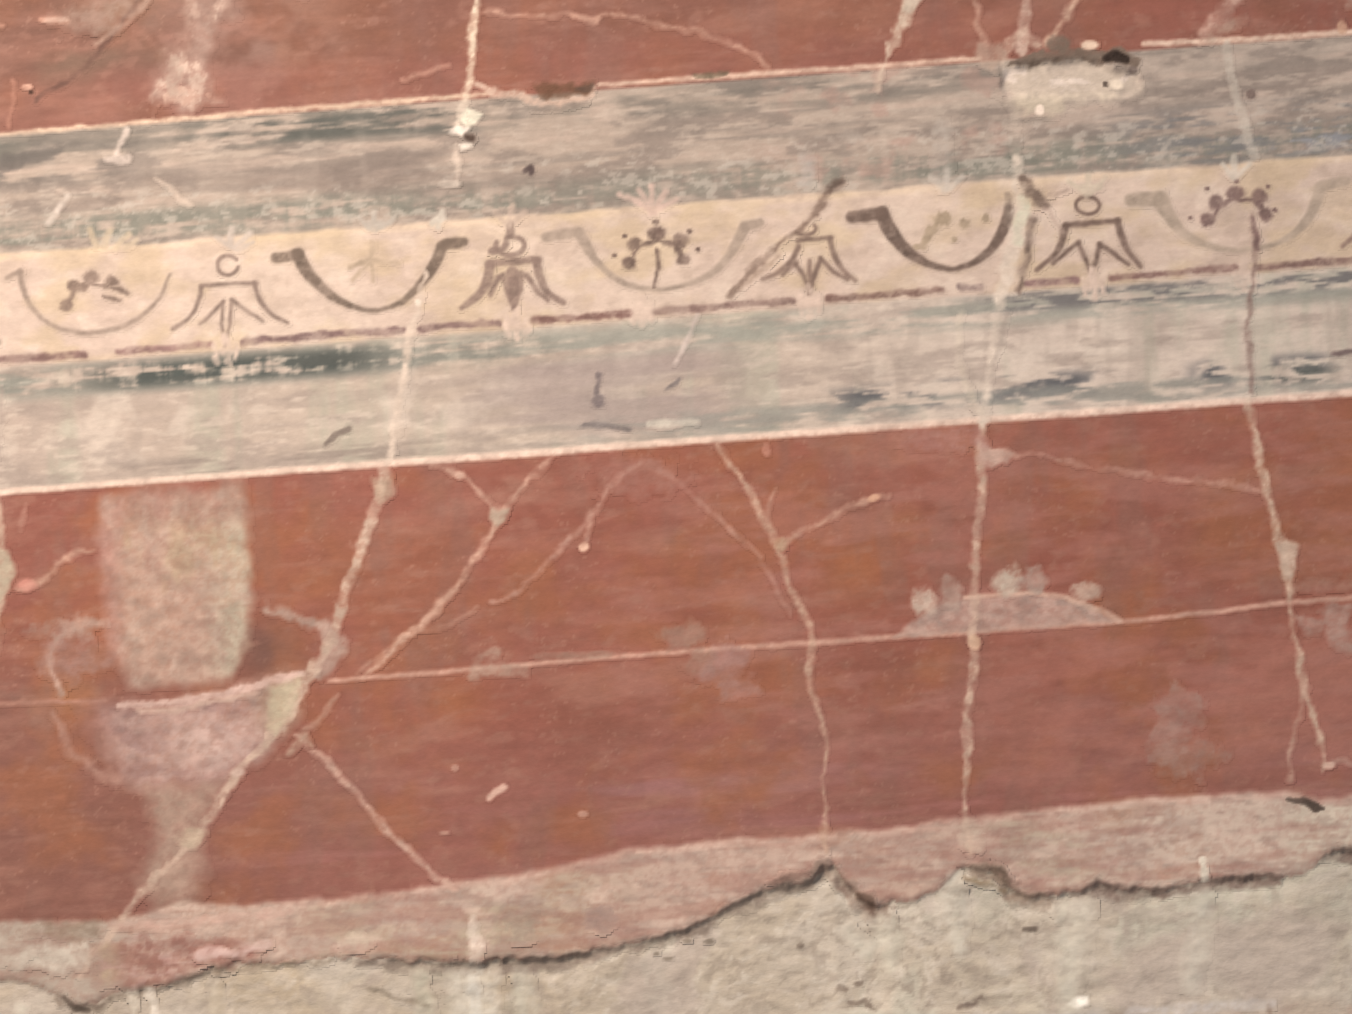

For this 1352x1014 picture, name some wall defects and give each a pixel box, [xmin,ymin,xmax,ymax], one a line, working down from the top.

crack [3,0,154,132]
crack [436,0,772,189]
crack [872,0,925,95]
flaking render [989,31,1148,128]
crack [724,174,849,302]
crack [952,0,1352,915]
crack [0,495,98,656]
crack [50,265,899,1014]
spalling [0,786,1352,1014]